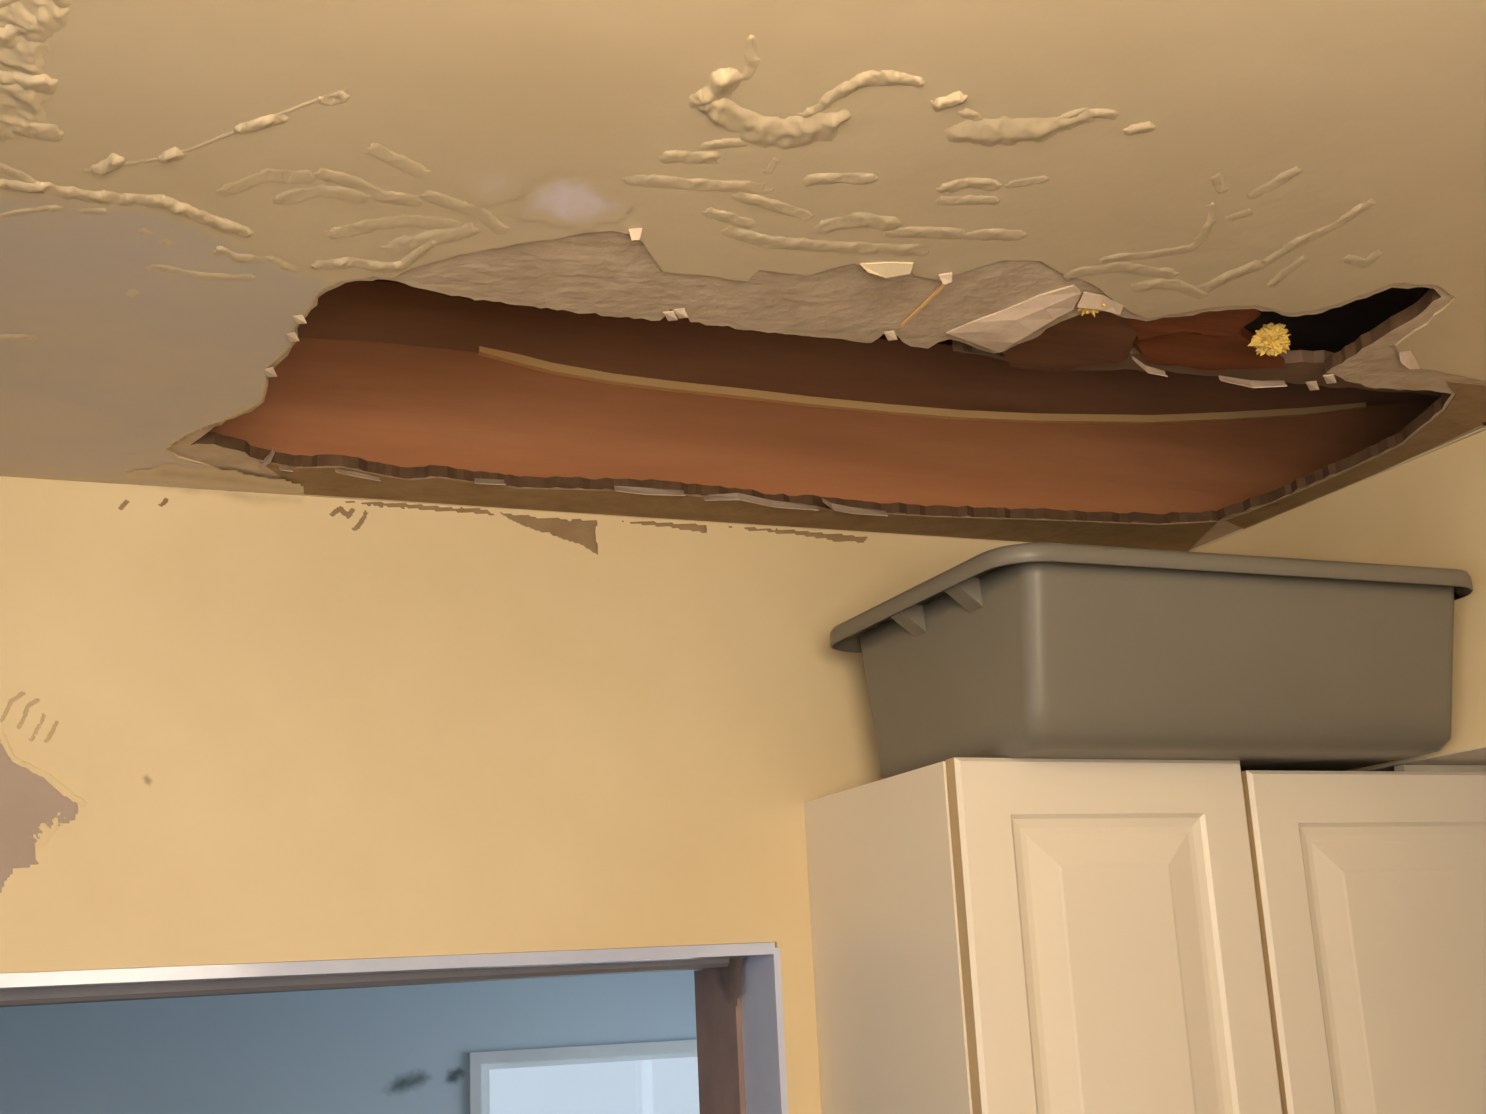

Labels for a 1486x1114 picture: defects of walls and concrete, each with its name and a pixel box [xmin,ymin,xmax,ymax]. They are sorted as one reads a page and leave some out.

spalling [0,191,1486,555]
peeling [0,692,87,893]